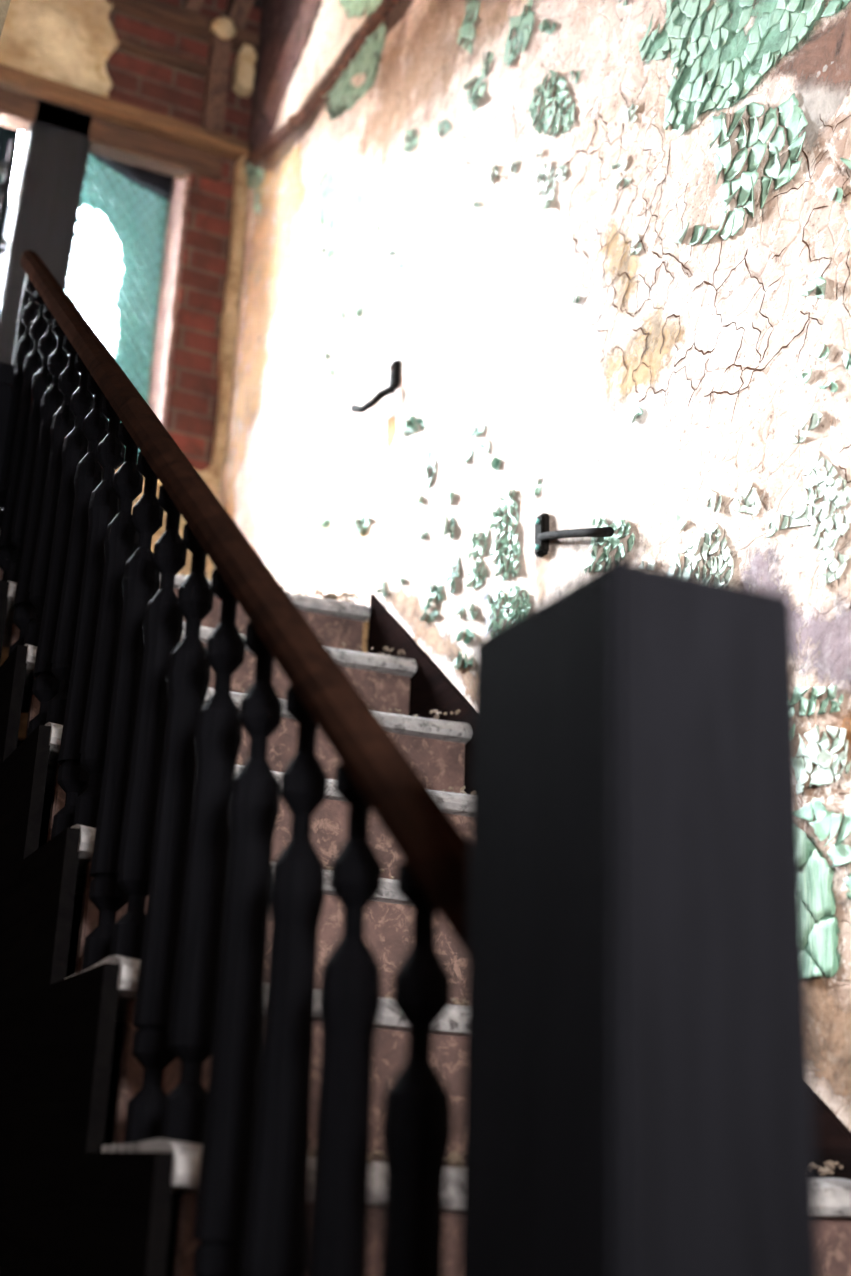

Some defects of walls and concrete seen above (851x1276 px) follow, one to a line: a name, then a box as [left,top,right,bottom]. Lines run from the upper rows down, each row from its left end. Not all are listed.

flaking render [244,0,413,213]
peeling [434,119,451,137]
peeling [457,0,556,112]
peeling [528,69,580,138]
peeling [622,104,638,123]
peeling [638,0,851,246]
peeling [353,128,851,700]
peeling [348,514,370,535]
crack [838,444,851,506]
flaking render [796,685,851,1109]